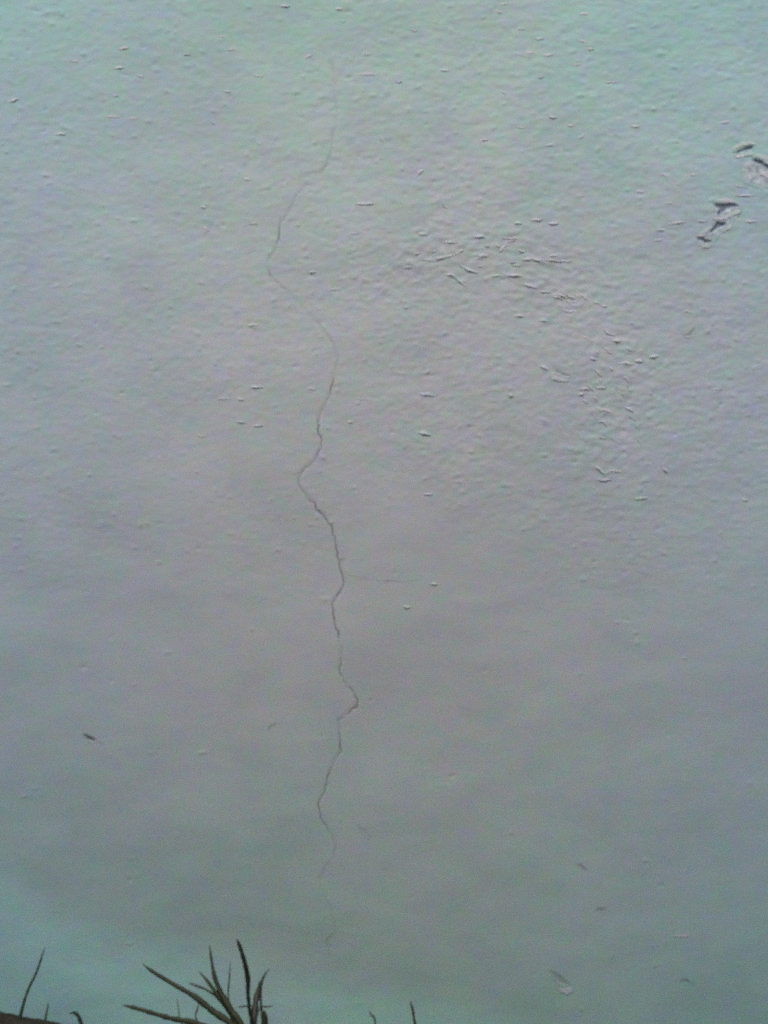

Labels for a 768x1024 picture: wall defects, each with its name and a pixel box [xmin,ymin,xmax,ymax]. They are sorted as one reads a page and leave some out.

spalling [732,141,768,189]
spalling [696,198,744,248]
crack [265,60,416,955]